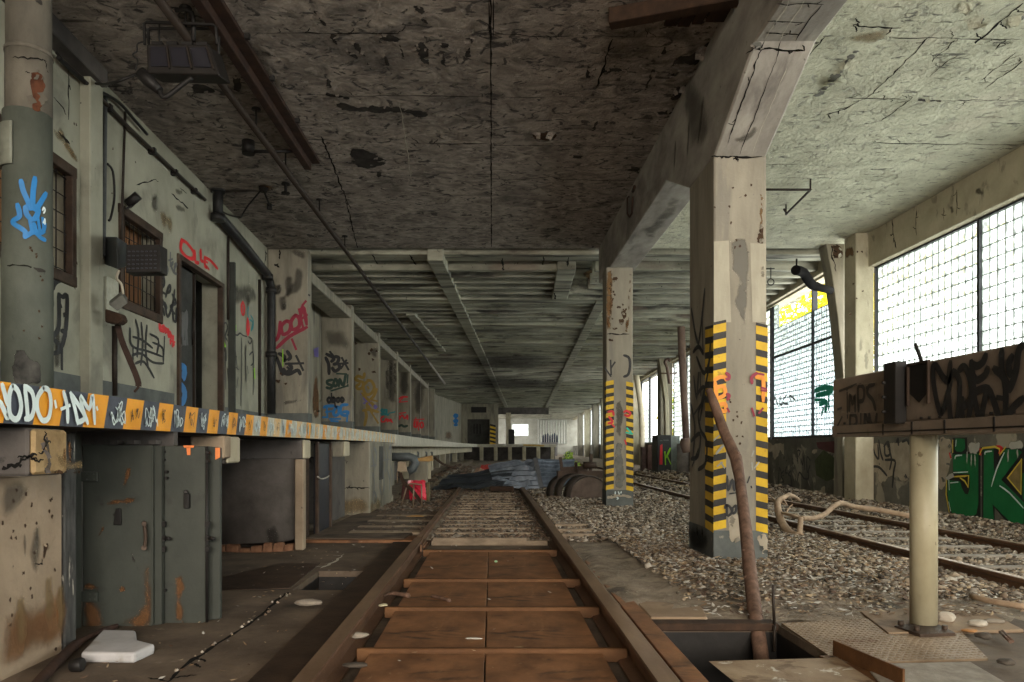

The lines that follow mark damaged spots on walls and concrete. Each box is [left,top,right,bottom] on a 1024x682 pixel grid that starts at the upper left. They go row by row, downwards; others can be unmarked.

crack [592,28,674,99]
crack [712,0,825,179]
crack [827,3,1024,148]
peeling [350,149,386,177]
crack [318,0,630,270]
peeling [12,350,41,385]
crack [2,431,74,470]